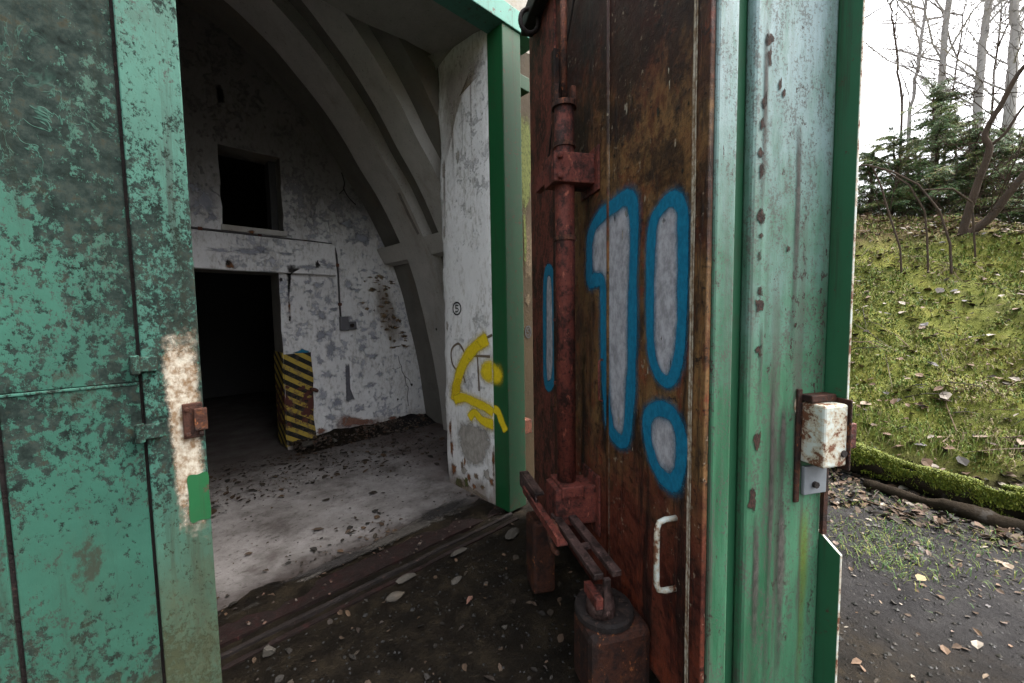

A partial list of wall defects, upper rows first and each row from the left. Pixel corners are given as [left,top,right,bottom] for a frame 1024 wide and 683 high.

rust [766,33,775,66]
rust [761,77,786,131]
peeling [302,260,337,377]
peeling [346,269,409,359]
peeling [163,336,204,525]